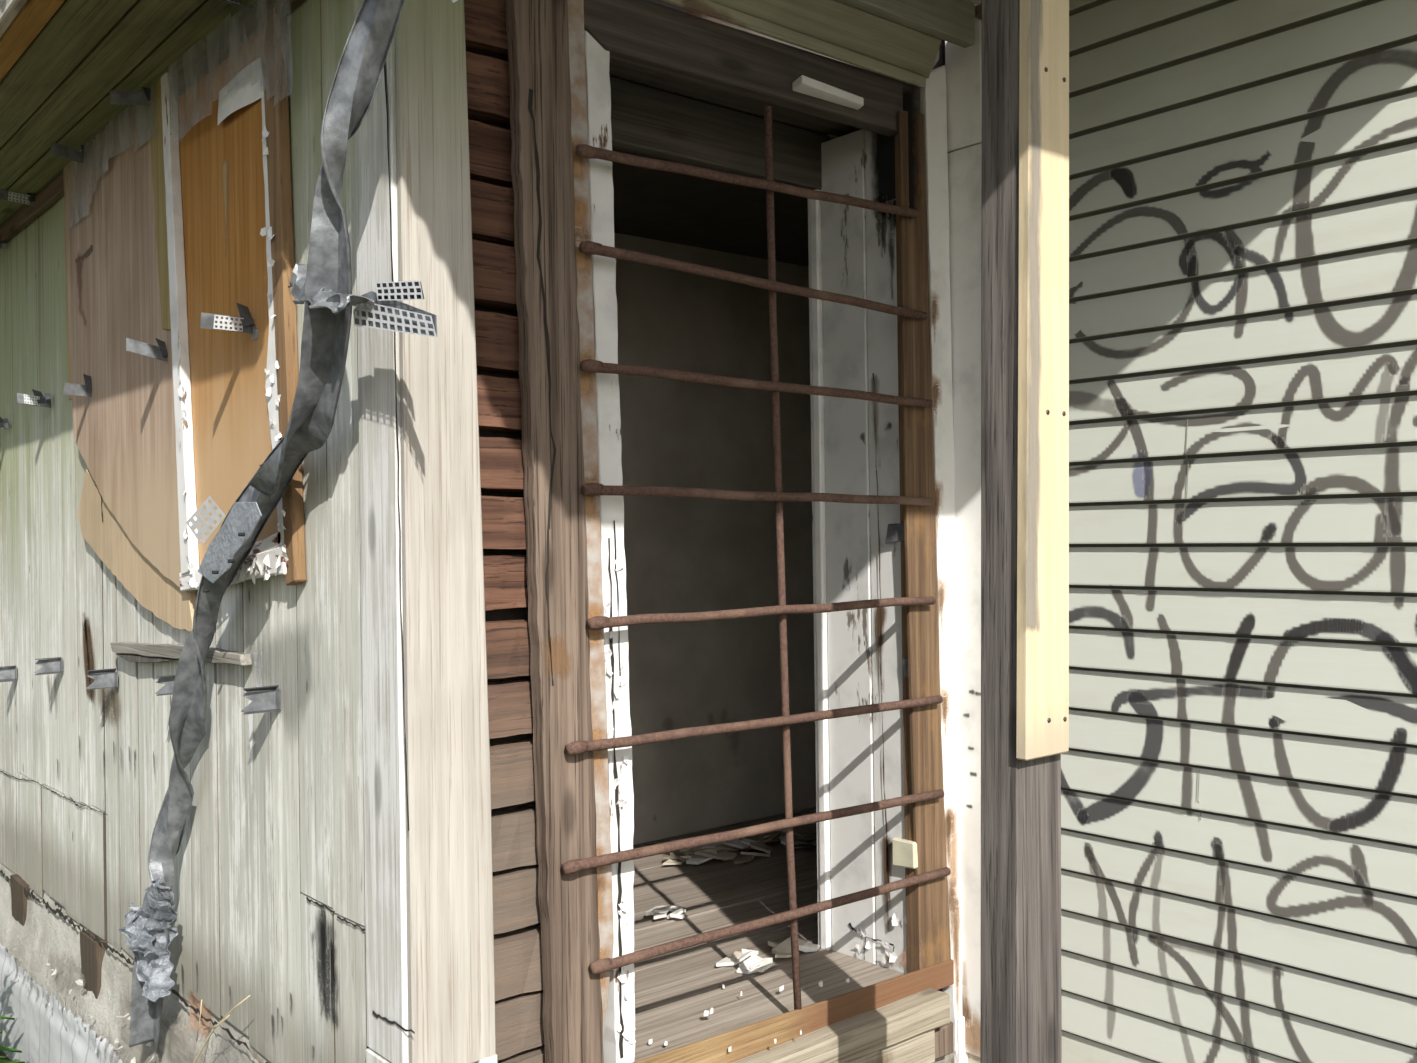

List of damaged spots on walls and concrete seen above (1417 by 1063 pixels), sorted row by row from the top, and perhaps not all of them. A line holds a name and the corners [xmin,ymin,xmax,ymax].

water stain [872,86,919,298]
peeling [264,361,282,456]
peeling [236,550,289,585]
rust [588,607,600,646]
crack [0,771,108,816]
peeling [605,521,636,1058]
flaking render [7,954,211,1063]
crack [173,989,268,1063]
water stain [312,907,338,1025]
crack [306,896,366,931]
crack [372,1011,415,1034]
rust [946,810,981,1052]